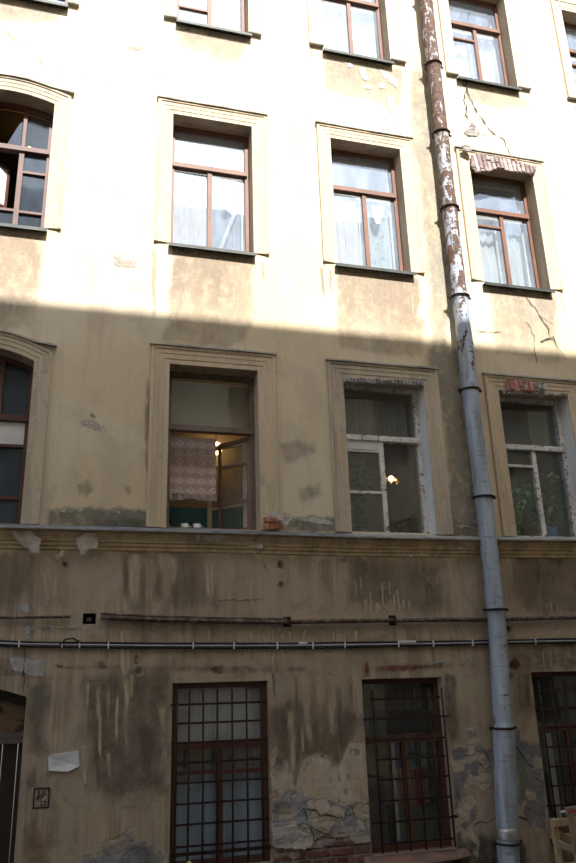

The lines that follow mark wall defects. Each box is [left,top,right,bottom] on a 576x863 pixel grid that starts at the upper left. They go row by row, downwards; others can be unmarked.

damp [326,60,401,94]
peeling [346,63,398,121]
crack [463,82,523,162]
damp [412,73,447,302]
flaking render [471,153,536,175]
damp [0,232,40,287]
damp [170,247,252,309]
damp [338,271,421,328]
crack [523,290,564,363]
peeling [270,742,371,863]
spalling [449,727,494,857]
spalling [515,728,548,832]